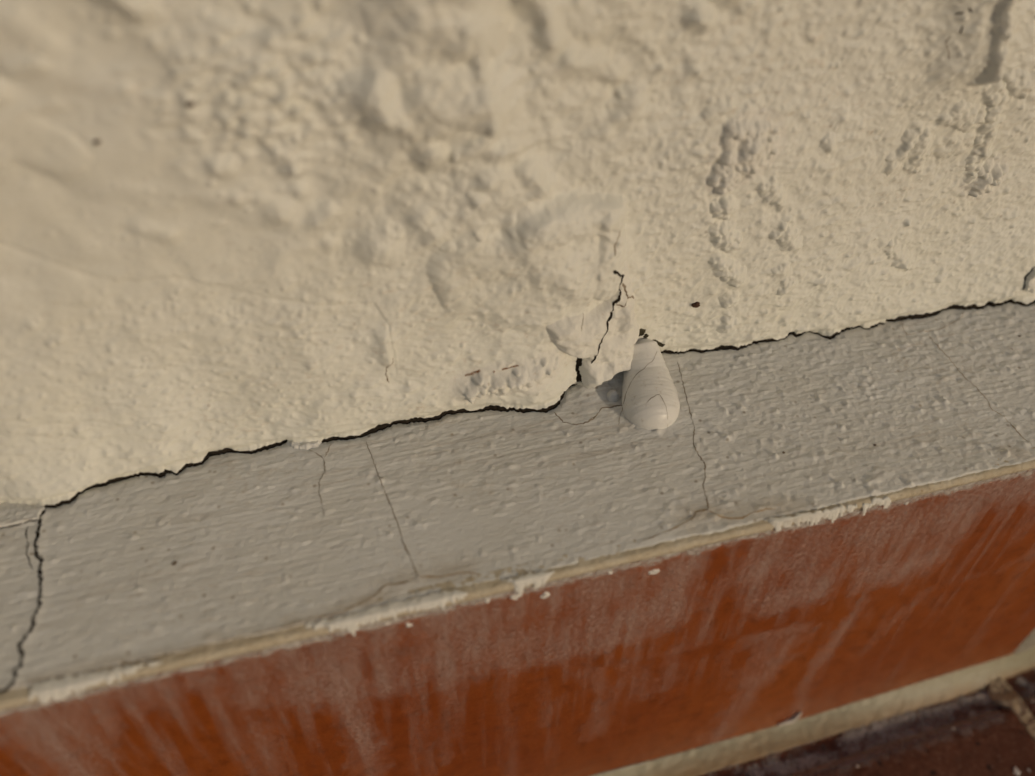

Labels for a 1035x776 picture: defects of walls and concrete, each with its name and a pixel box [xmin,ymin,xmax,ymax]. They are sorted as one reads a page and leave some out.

efflorescence [0,471,1031,716]
crack [0,232,1035,693]